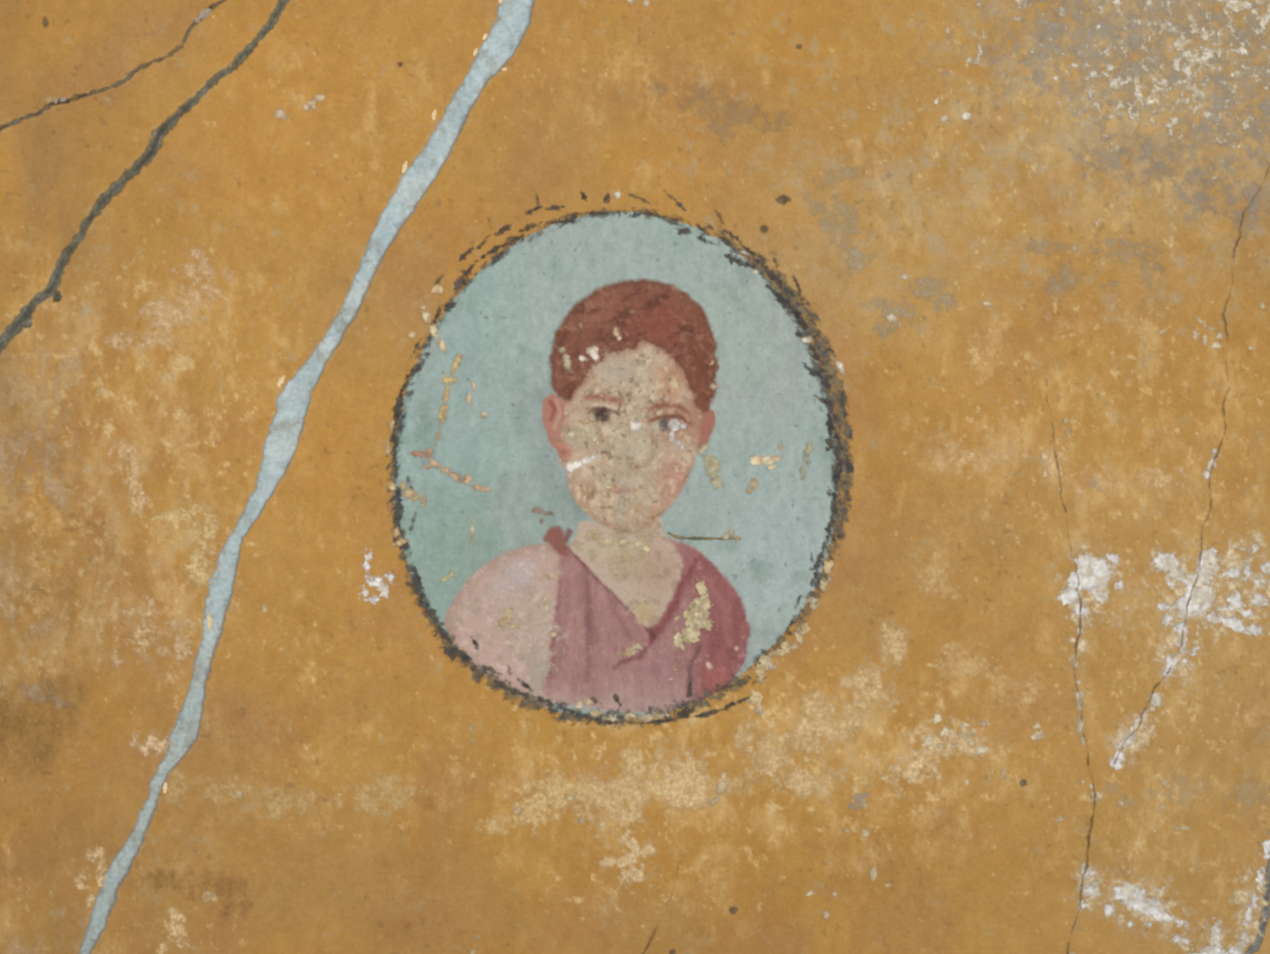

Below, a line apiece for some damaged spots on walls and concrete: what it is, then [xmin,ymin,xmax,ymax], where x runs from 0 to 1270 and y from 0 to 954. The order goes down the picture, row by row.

crack [0,0,289,352]
crack [1222,211,1245,336]
peeling [560,346,599,370]
crack [80,0,534,954]
peeling [668,419,722,489]
crack [1074,598,1082,686]
spalling [1057,551,1123,636]
spalling [1153,544,1270,680]
spalling [1109,692,1165,770]
crack [1067,758,1116,954]
spalling [1075,840,1270,954]
crack [1245,858,1270,954]